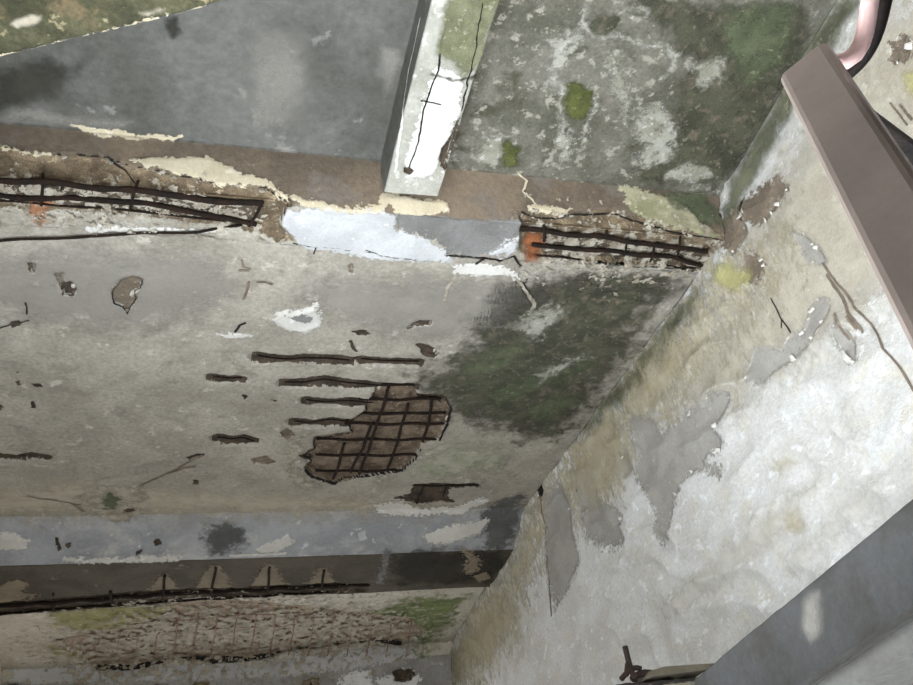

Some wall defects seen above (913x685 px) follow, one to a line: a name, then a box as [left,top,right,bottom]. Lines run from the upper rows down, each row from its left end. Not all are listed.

water stain [547,28,585,90]
water stain [603,44,713,183]
water stain [853,0,913,139]
peeling [887,32,913,65]
spalling [0,147,294,247]
crack [517,173,538,207]
peeling [395,173,790,297]
water stain [315,274,671,341]
spalling [279,378,452,485]
water stain [393,139,880,685]
spalling [394,482,481,505]
spalling [0,563,475,685]